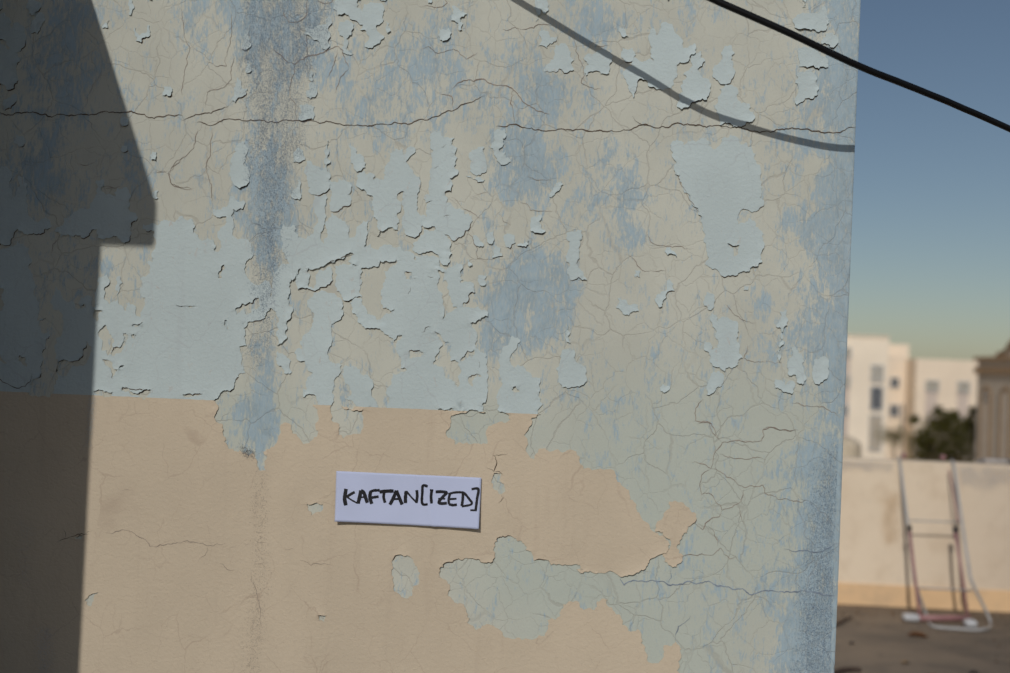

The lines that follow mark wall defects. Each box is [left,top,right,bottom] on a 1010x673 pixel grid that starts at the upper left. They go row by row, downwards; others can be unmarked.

peeling [305,0,391,56]
crack [1,0,855,198]
peeling [534,0,765,281]
peeling [792,0,838,105]
peeling [291,129,546,318]
peeling [56,304,142,377]
peeling [214,351,319,471]
peeling [409,332,482,387]
peeling [446,399,510,445]
peeling [703,292,743,396]
peeling [774,310,829,394]
crack [620,399,836,596]